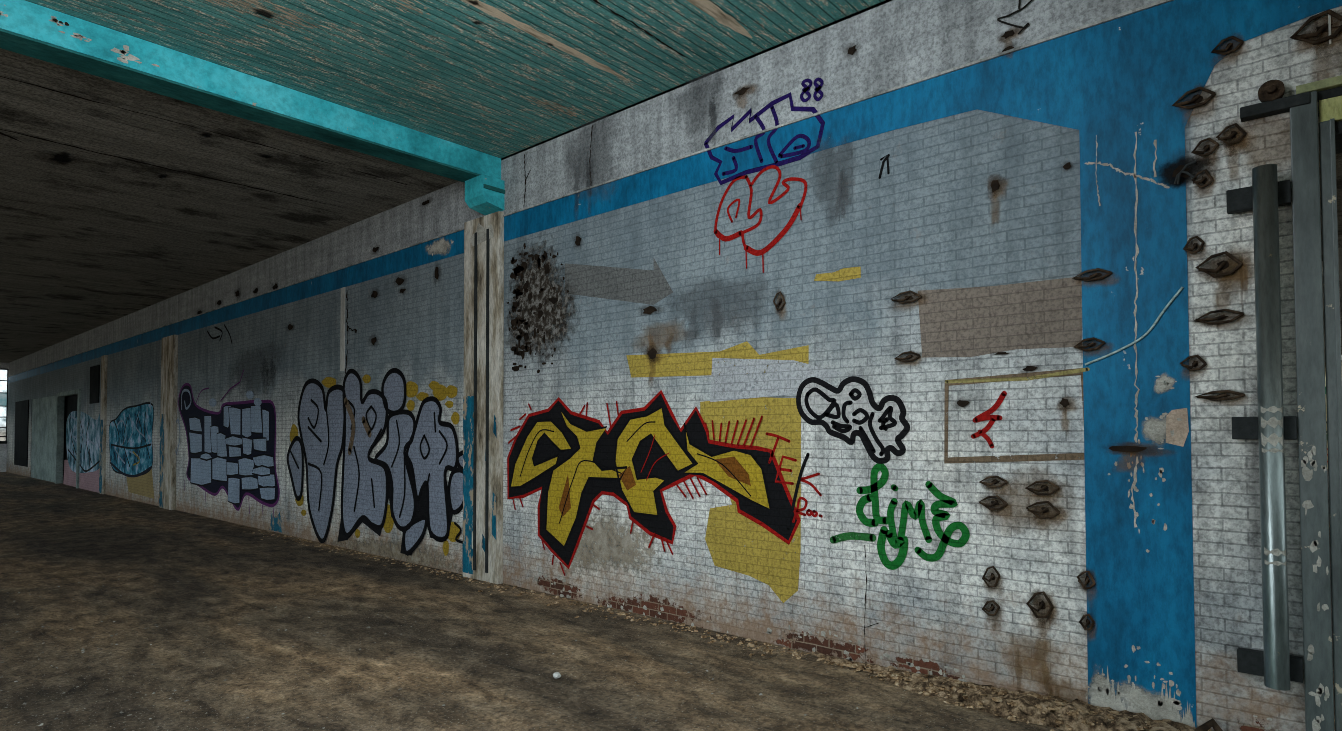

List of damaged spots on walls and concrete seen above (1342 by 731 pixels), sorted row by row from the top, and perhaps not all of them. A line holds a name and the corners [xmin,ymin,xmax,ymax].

crack [1085,132,1170,527]
peeling [1154,374,1177,393]
peeling [1108,408,1189,533]
peeling [1301,446,1327,481]
peeling [1310,531,1329,575]
peeling [1086,645,1195,727]
peeling [1309,683,1330,731]